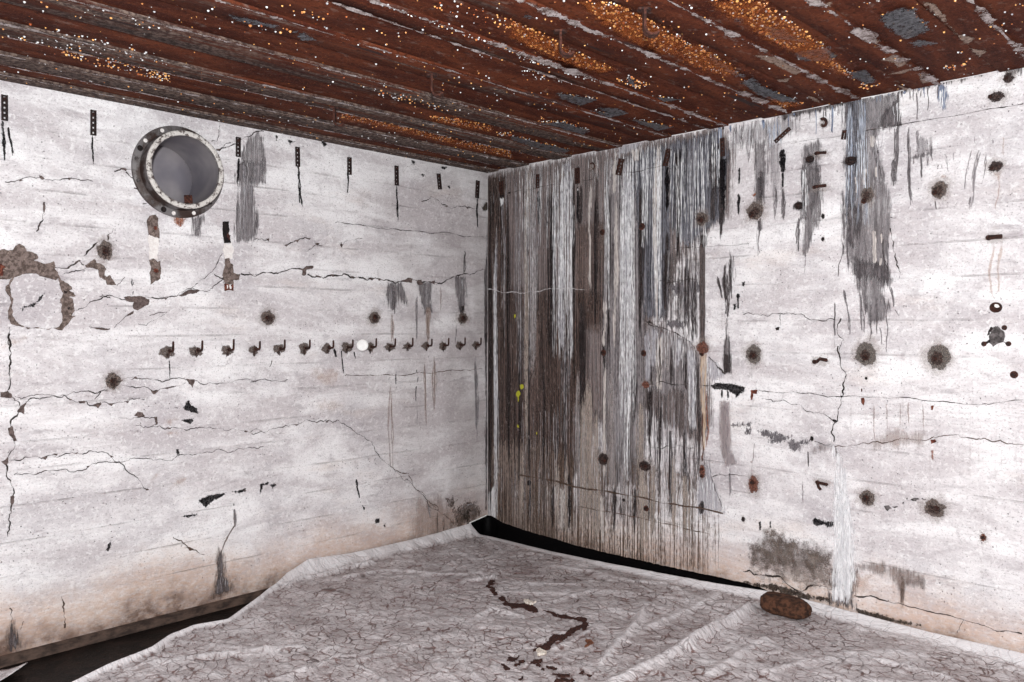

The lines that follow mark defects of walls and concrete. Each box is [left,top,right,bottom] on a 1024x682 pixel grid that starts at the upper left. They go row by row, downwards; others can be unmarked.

rust [582,3,737,75]
rust [880,8,929,40]
rust [557,93,674,131]
flaking render [0,244,75,330]
flaking render [85,240,125,285]
flaking render [147,215,161,285]
crack [76,184,554,330]
leakage [0,0,966,570]
crack [743,312,1022,447]
crack [0,327,455,536]
leakage [215,511,237,594]
leakage [743,445,923,626]